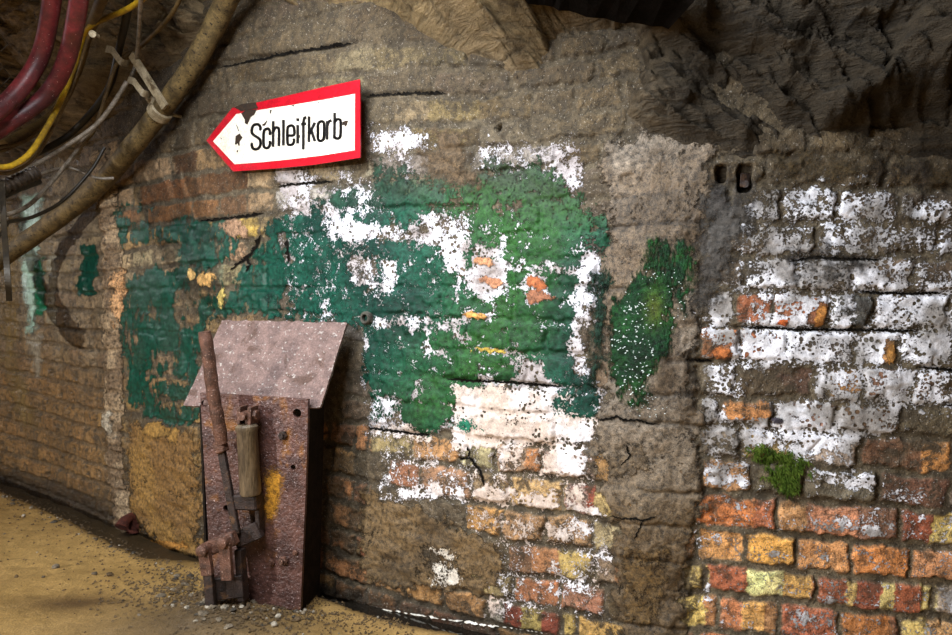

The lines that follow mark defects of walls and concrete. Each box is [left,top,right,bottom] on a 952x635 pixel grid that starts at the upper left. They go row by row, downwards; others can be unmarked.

peeling [75,244,100,296]
peeling [109,122,616,626]
crack [919,365,952,373]
crack [598,415,657,425]
peeling [691,169,952,635]
crack [458,447,484,486]